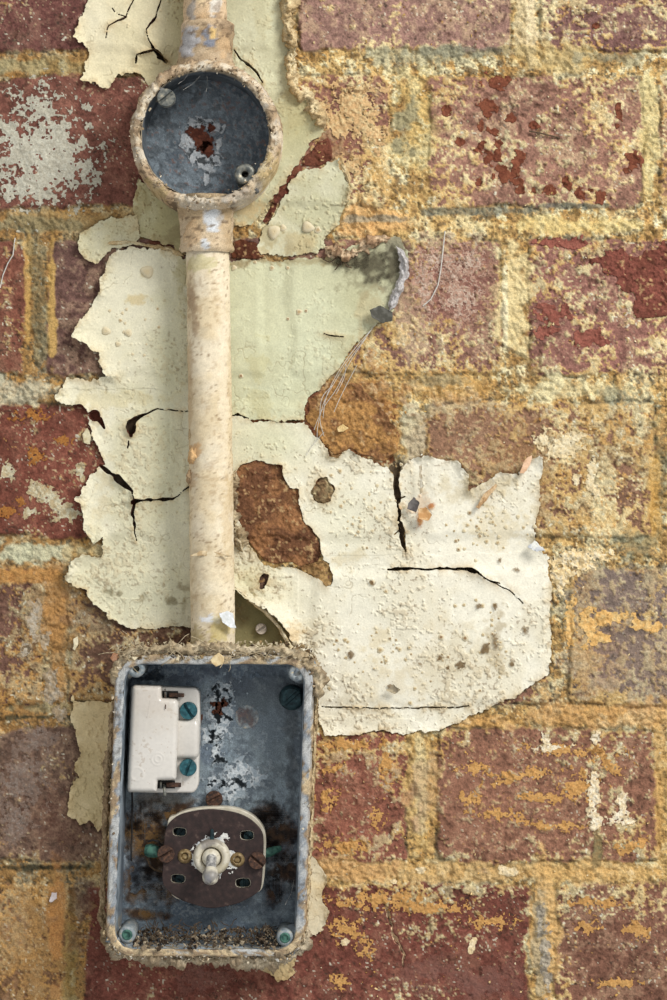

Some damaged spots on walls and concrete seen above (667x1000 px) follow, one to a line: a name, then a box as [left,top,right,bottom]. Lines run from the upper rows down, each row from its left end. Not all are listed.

crack [106,0,165,61]
spalling [455,71,612,205]
spalling [615,102,623,129]
spalling [623,150,644,174]
peeling [55,0,552,736]
crack [90,408,183,445]
crack [101,466,188,541]
crack [388,461,519,600]
peeling [67,695,124,841]